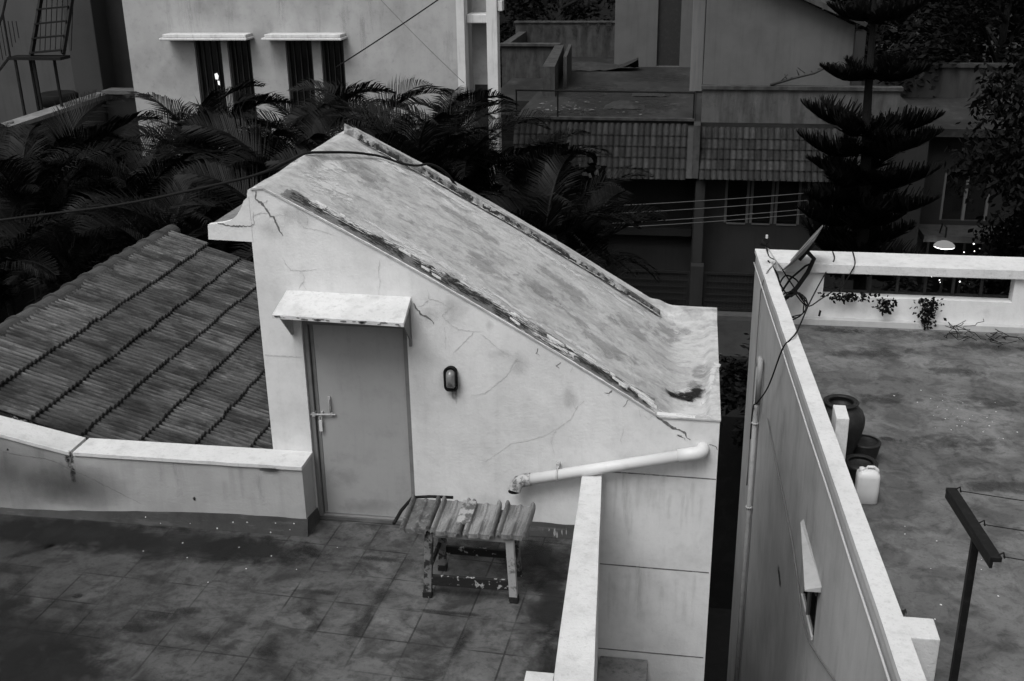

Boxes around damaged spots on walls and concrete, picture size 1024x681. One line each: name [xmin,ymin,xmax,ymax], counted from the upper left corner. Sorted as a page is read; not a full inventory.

crack [218,191,335,289]
peeling [266,134,720,429]
crack [414,292,573,395]
leakage [0,520,307,562]